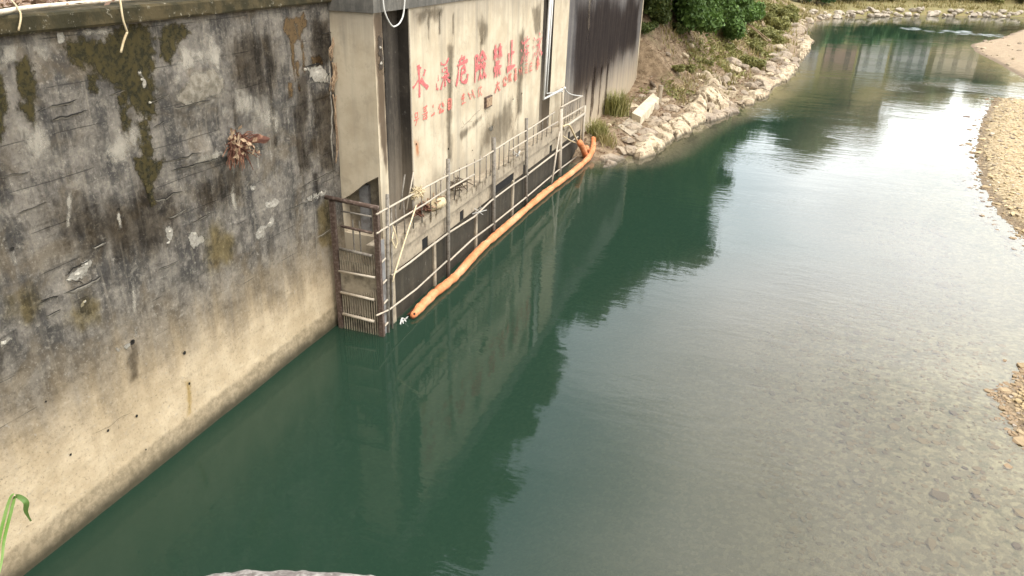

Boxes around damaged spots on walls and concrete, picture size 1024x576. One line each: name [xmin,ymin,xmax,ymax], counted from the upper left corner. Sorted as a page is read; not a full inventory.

leakage [87,70,99,94]
rust [283,12,323,98]
spalling [304,64,330,83]
leakage [575,0,638,117]
leakage [105,92,154,163]
spalling [66,259,92,282]